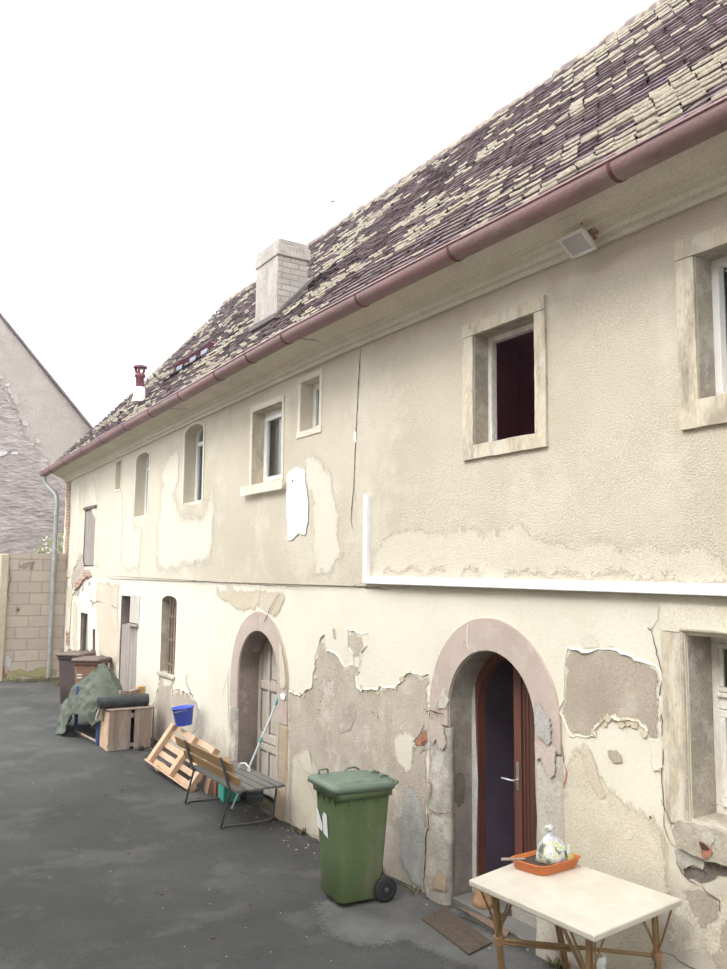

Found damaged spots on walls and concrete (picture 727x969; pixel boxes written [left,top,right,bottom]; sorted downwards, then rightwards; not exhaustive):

crack [351,347,361,528]
flaking render [278,628,449,893]
flaking render [533,635,665,798]
crack [647,611,678,849]
flaking render [674,839,727,929]